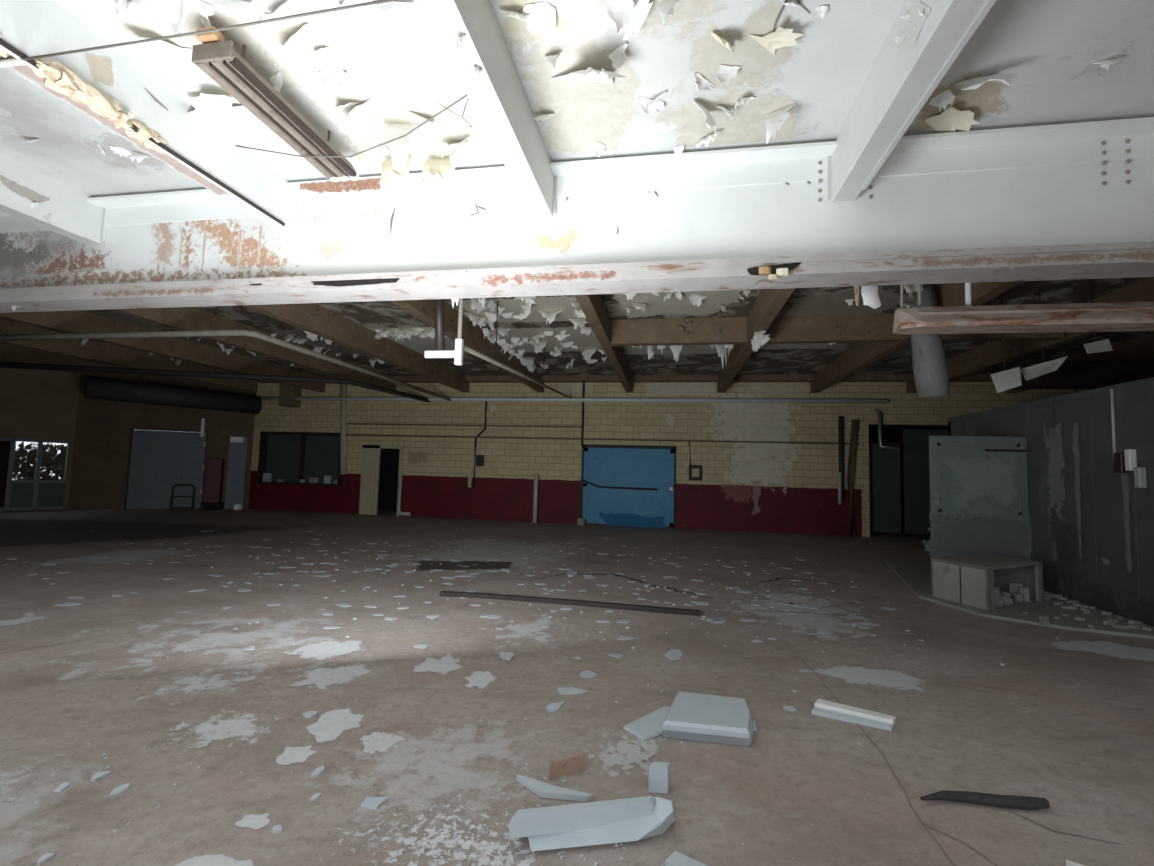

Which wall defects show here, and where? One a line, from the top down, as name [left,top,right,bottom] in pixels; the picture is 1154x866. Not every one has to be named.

spalling [30,53,171,175]
peeling [93,0,499,186]
peeling [493,0,819,163]
peeling [910,68,1019,133]
peeling [0,174,50,209]
corrosion [298,177,383,195]
corrosion [0,218,400,300]
corrosion [480,219,622,288]
peeling [452,296,607,373]
peeling [558,383,595,396]
peeling [623,345,734,367]
peeling [612,290,751,319]